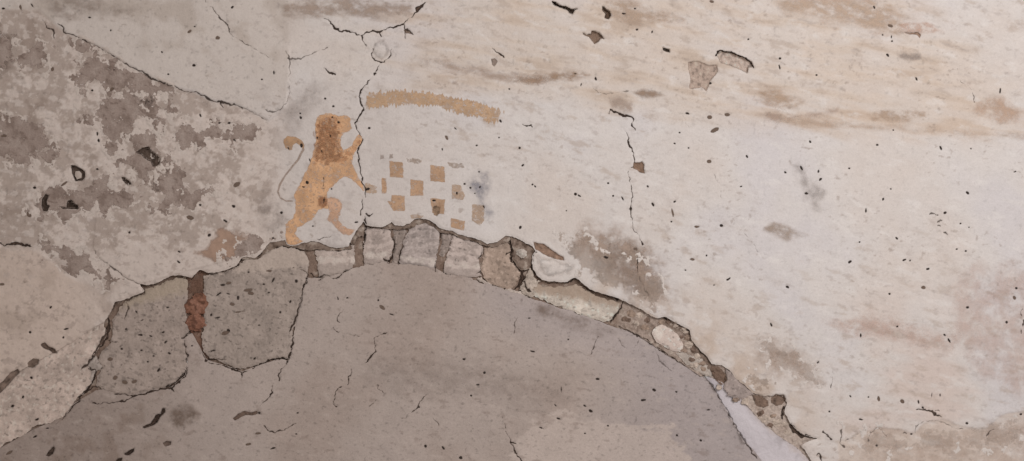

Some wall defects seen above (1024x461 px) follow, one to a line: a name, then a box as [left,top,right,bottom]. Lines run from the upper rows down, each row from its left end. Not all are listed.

crack [46,24,263,119]
spalling [688,50,754,91]
crack [329,2,426,265]
crack [609,109,644,271]
spalling [216,270,275,313]
spalling [215,221,365,273]
spalling [382,199,579,276]
leakage [577,234,656,292]
peeling [583,226,669,316]
spalling [0,359,39,392]
crack [62,259,347,433]